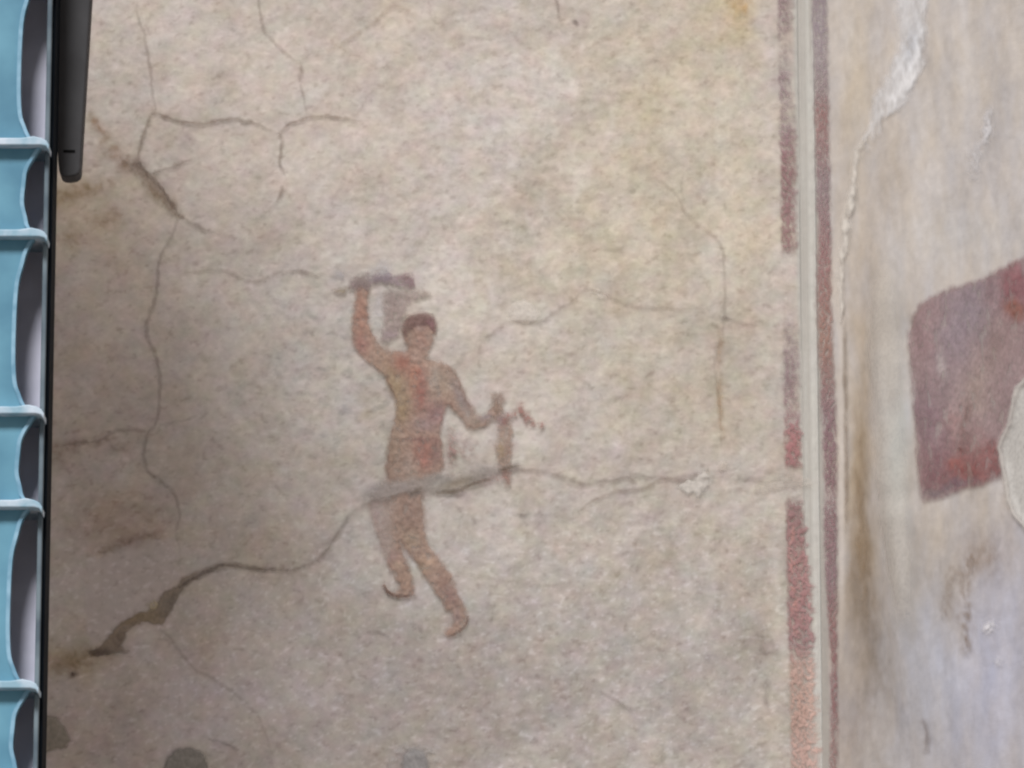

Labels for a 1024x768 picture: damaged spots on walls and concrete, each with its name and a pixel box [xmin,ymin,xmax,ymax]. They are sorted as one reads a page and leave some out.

flaking render [998,380,1024,527]